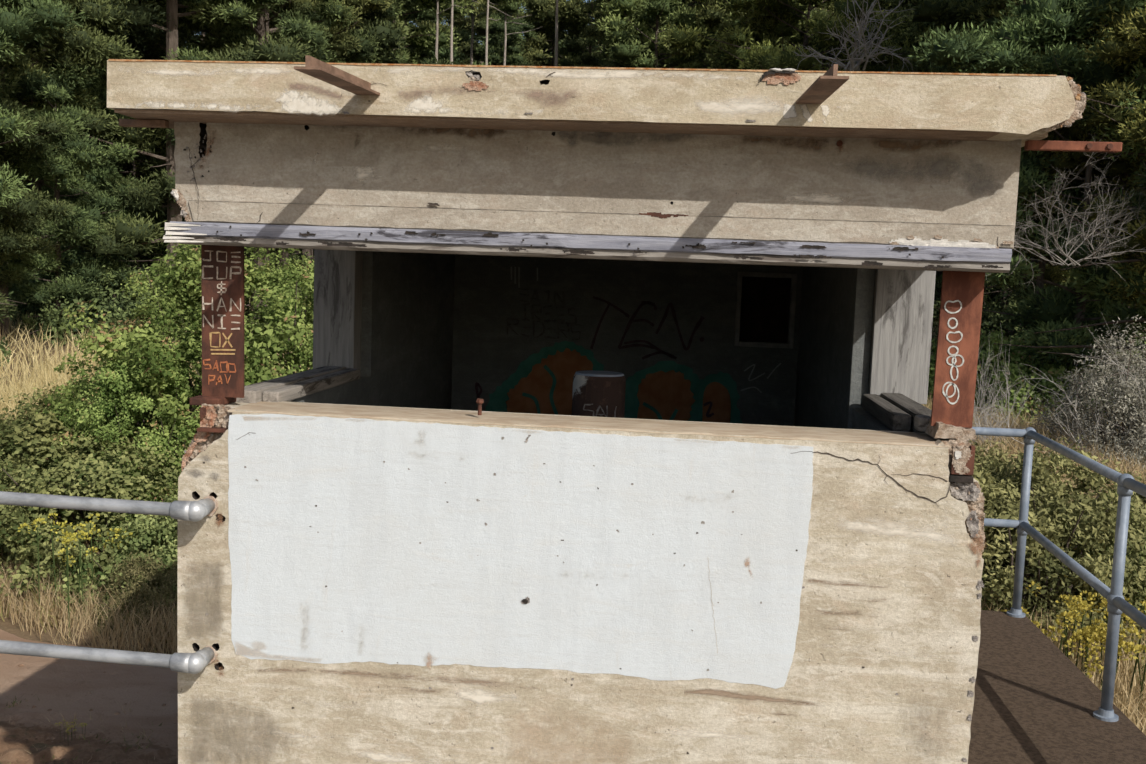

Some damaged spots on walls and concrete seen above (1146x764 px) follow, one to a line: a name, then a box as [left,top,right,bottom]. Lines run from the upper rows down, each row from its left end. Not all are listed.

spalling [760,68,801,85]
spalling [1041,77,1087,131]
spalling [171,189,191,222]
spalling [181,403,235,473]
crack [796,451,950,507]
spalling [942,438,985,557]